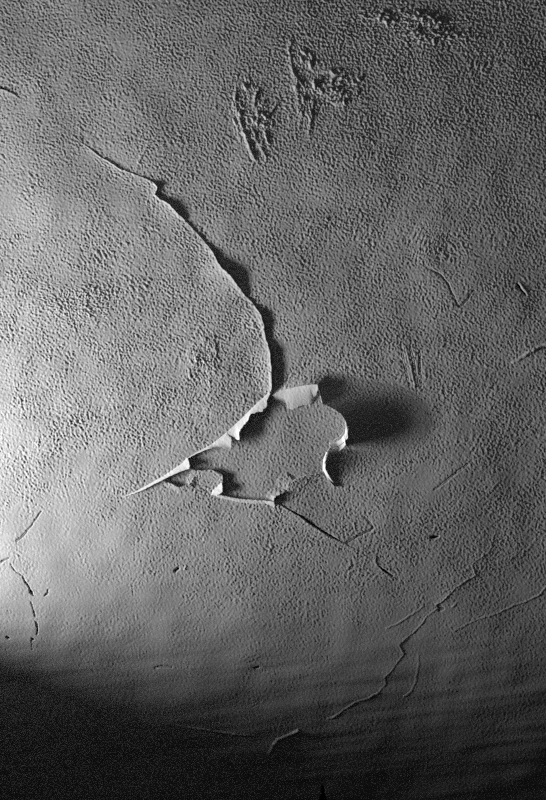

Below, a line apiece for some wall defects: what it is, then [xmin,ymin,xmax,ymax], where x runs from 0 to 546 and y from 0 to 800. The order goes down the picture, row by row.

peeling [123,370,436,508]
crack [272,503,394,581]
crack [23,577,38,649]
crack [328,527,546,720]
crack [267,729,300,756]